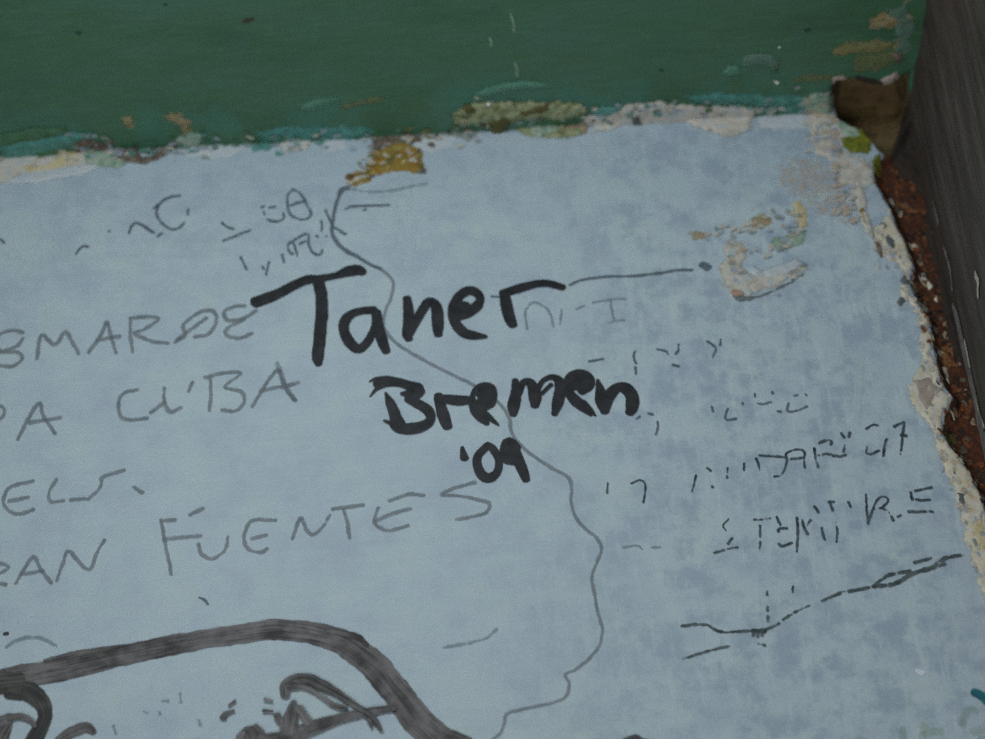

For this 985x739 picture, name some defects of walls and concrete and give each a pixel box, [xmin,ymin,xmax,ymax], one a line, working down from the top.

rust [345,134,427,186]
peeling [0,72,985,595]
peeling [832,0,915,72]
rust [874,111,985,506]